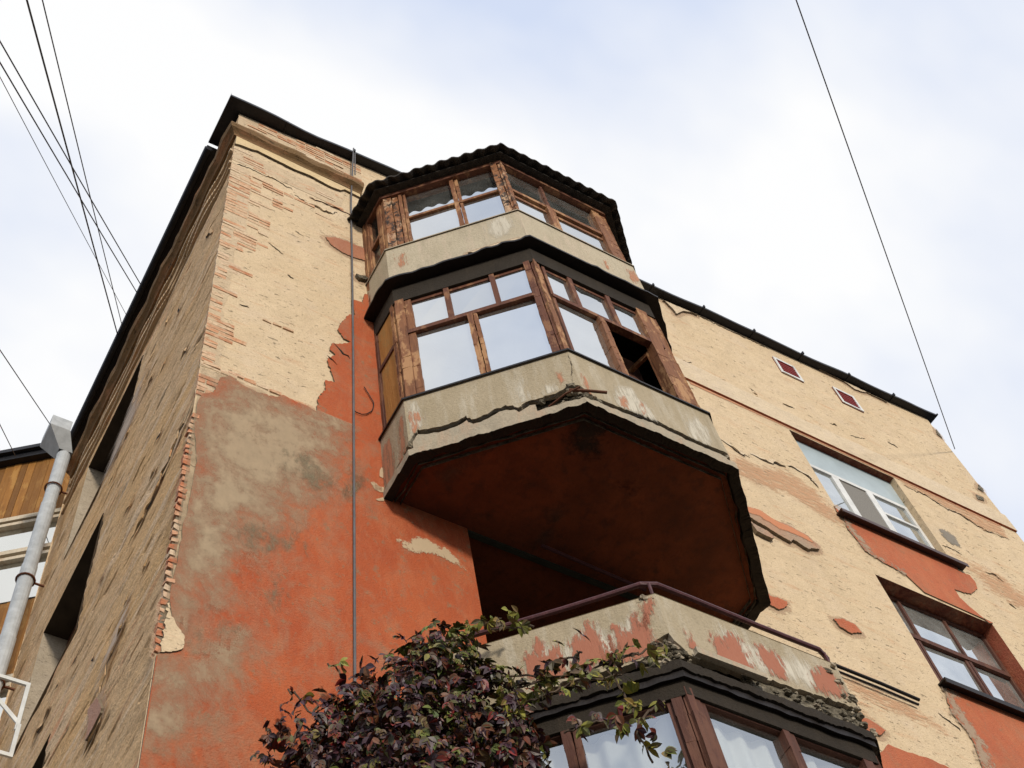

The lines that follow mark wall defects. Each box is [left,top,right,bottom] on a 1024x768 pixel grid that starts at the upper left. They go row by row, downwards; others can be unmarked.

crack [239,149,337,214]
spalling [194,147,350,410]
peeling [322,235,368,284]
crack [424,356,573,432]
crack [602,403,819,488]
peeling [689,381,1008,538]
spalling [150,412,199,659]
peeling [397,536,466,570]
peeling [735,455,906,575]
peeling [768,595,791,614]
peeling [829,616,865,638]
spalling [740,662,947,741]